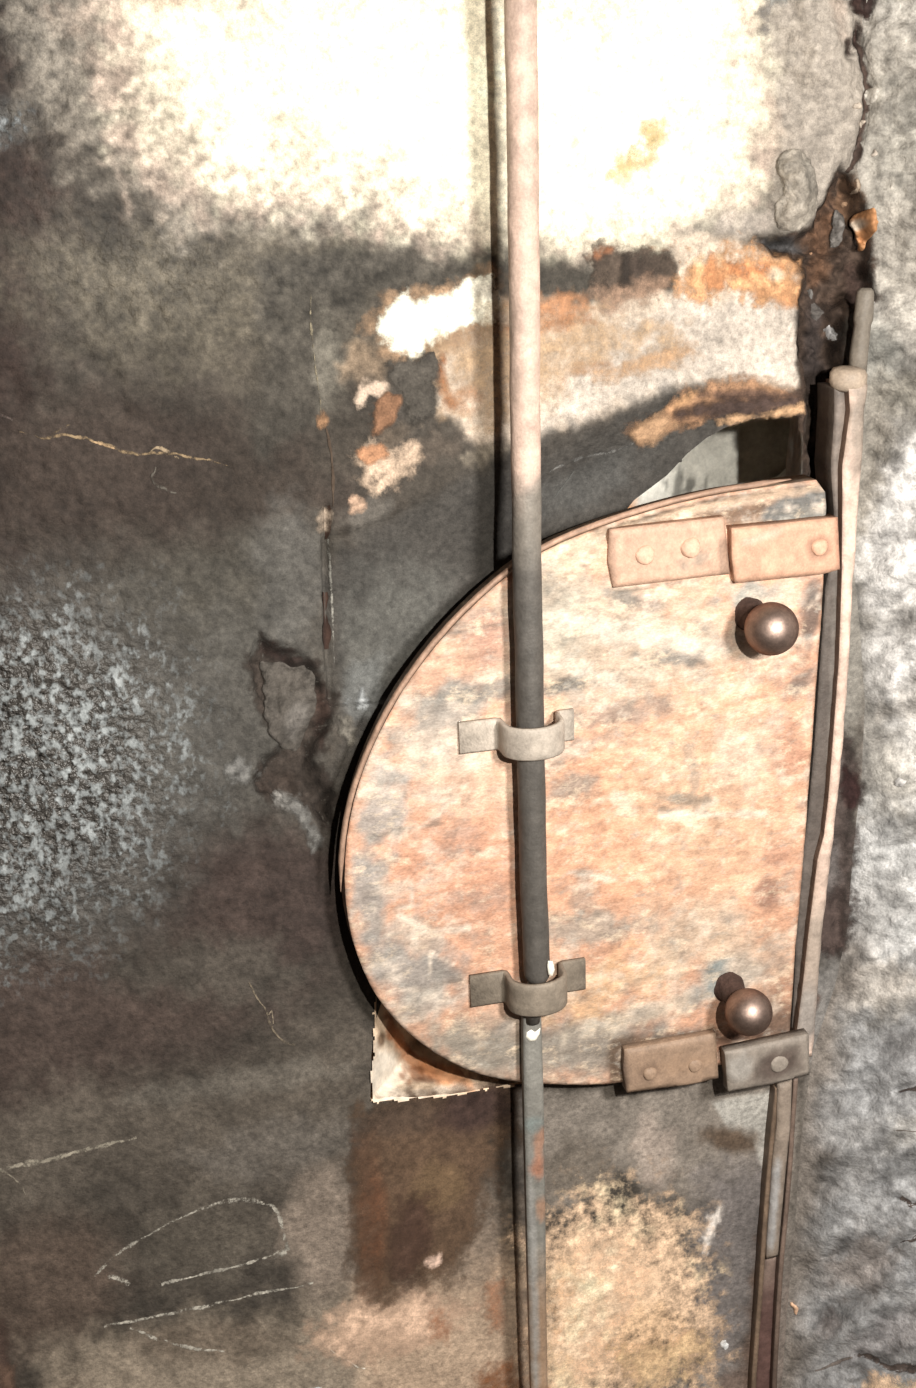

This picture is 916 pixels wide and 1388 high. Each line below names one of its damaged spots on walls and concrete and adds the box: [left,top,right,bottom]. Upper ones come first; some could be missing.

crack [845,0,880,173]
peeling [317,413,328,429]
peeling [349,267,500,514]
spalling [761,167,879,480]
peeling [317,508,333,531]
leakage [0,607,189,940]
crack [893,1196,916,1248]